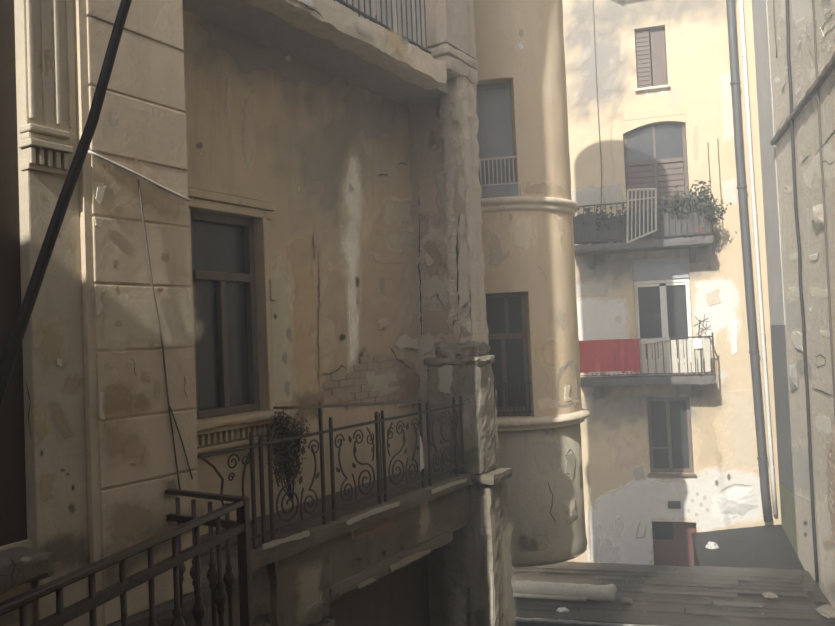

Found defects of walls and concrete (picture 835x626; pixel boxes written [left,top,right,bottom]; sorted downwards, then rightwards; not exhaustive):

peeling [779,0,812,30]
crack [801,130,835,165]
peeling [730,320,738,355]
peeling [437,364,453,394]